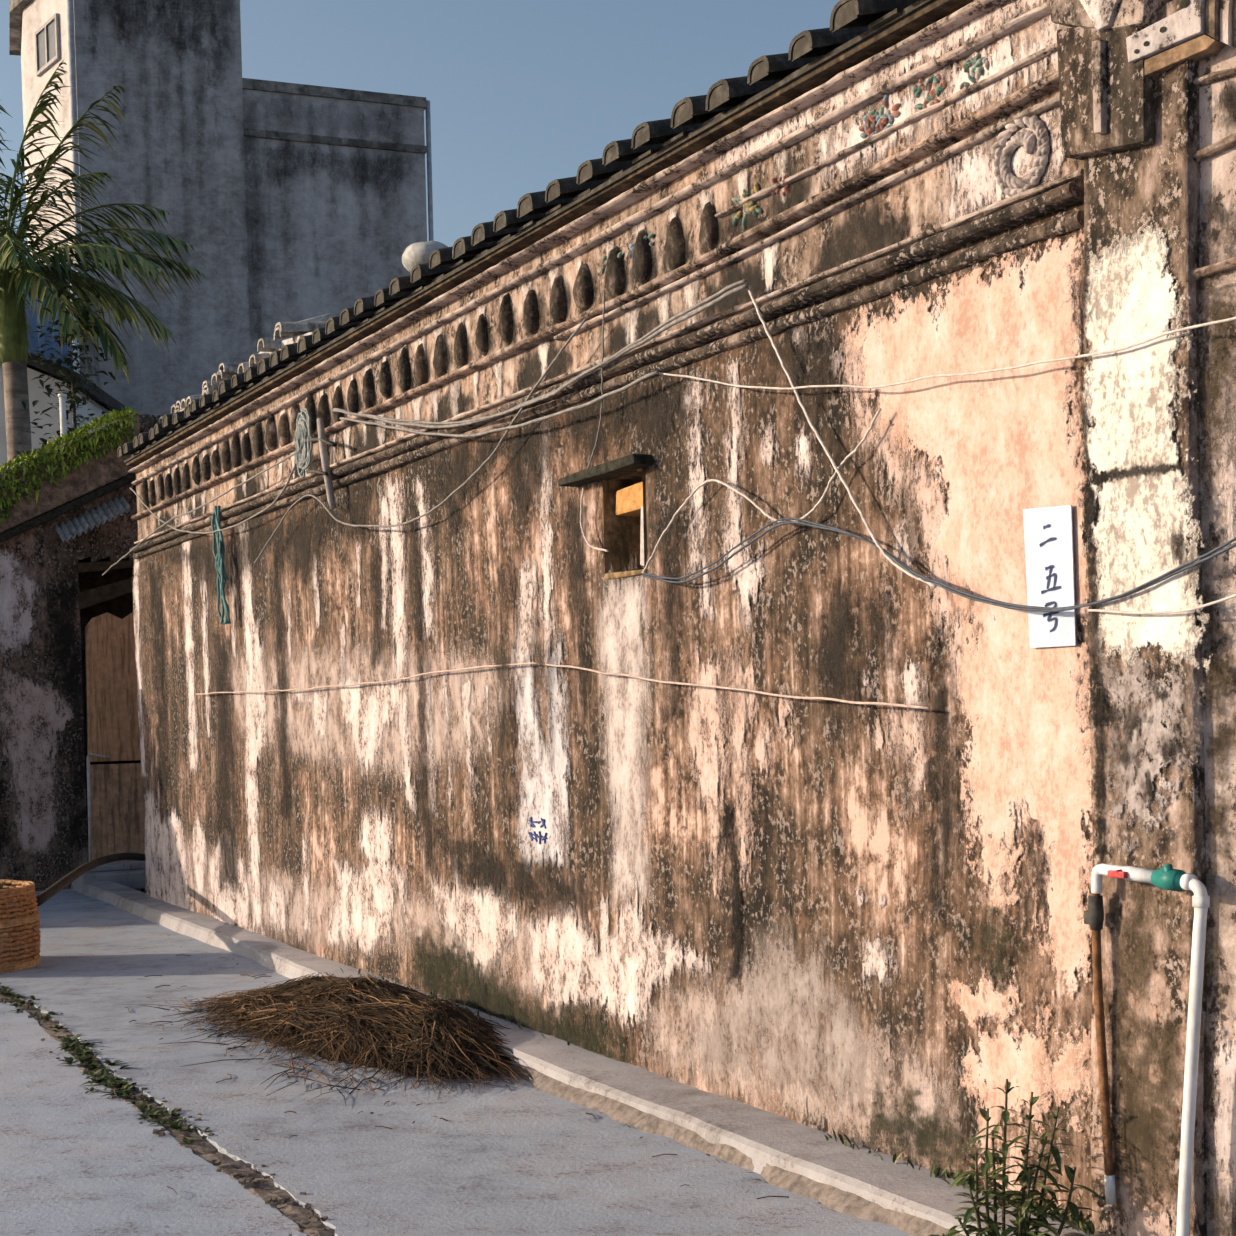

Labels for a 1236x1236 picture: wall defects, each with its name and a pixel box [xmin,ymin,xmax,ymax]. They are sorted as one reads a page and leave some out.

damp [684,240,781,325]
damp [667,129,831,265]
damp [759,326,835,434]
damp [811,201,909,276]
damp [1196,195,1236,515]
damp [132,249,768,1062]
damp [923,624,960,926]
damp [1025,818,1050,913]
damp [1199,539,1236,1001]
damp [650,968,979,1182]
damp [1102,853,1185,1200]
damp [1203,1034,1236,1236]